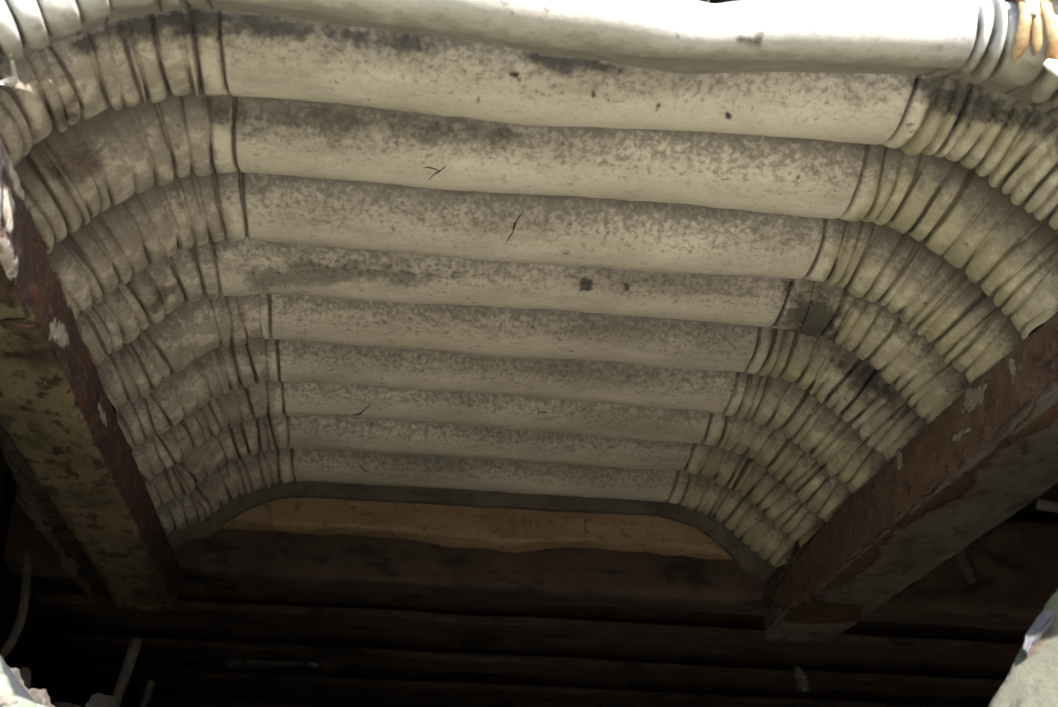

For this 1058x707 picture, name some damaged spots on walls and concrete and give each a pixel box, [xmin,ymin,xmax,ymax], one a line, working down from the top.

water stain [529,53,622,74]
water stain [915,78,1042,132]
water stain [774,282,842,345]
corrosion [0,164,181,612]
water stain [831,360,893,399]
corrosion [765,314,1058,624]